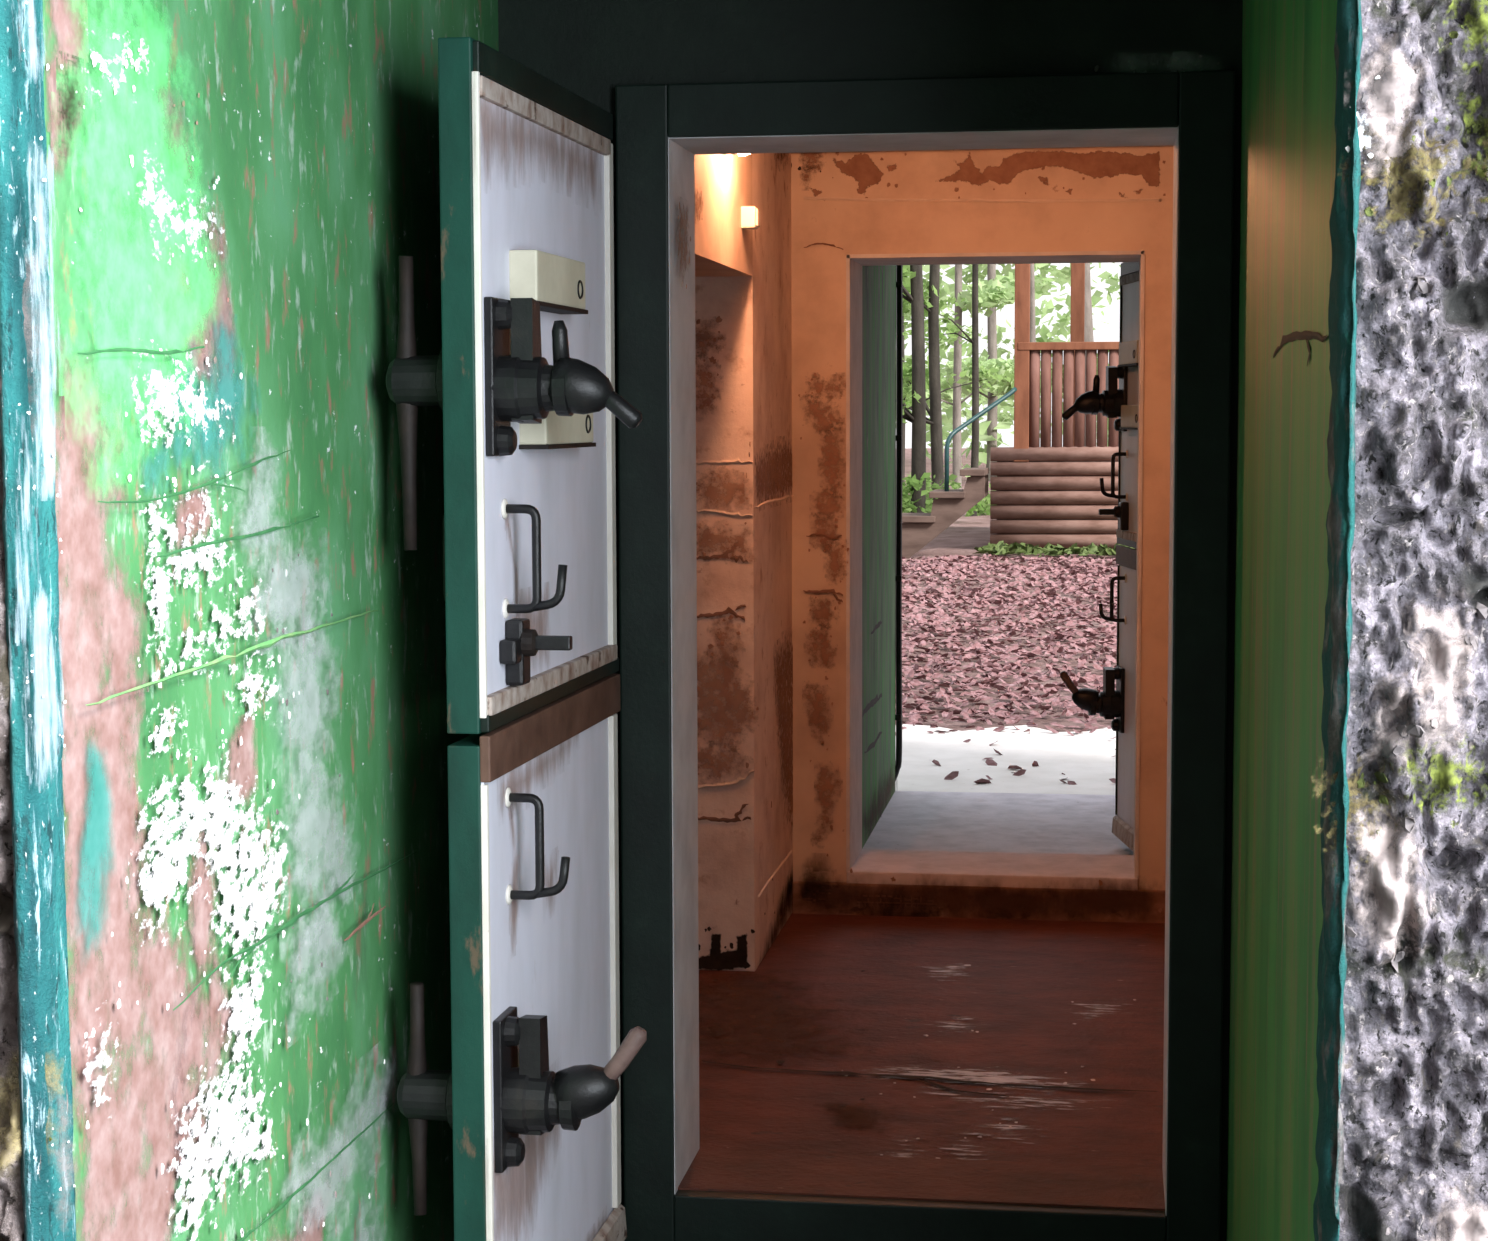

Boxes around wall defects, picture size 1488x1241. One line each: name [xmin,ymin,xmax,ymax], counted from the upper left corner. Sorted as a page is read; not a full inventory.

peeling [811,152,907,201]
peeling [939,150,1166,199]
peeling [15,0,317,1241]
water stain [764,748,1162,957]
water stain [699,974,847,1063]
peeling [241,1171,337,1241]